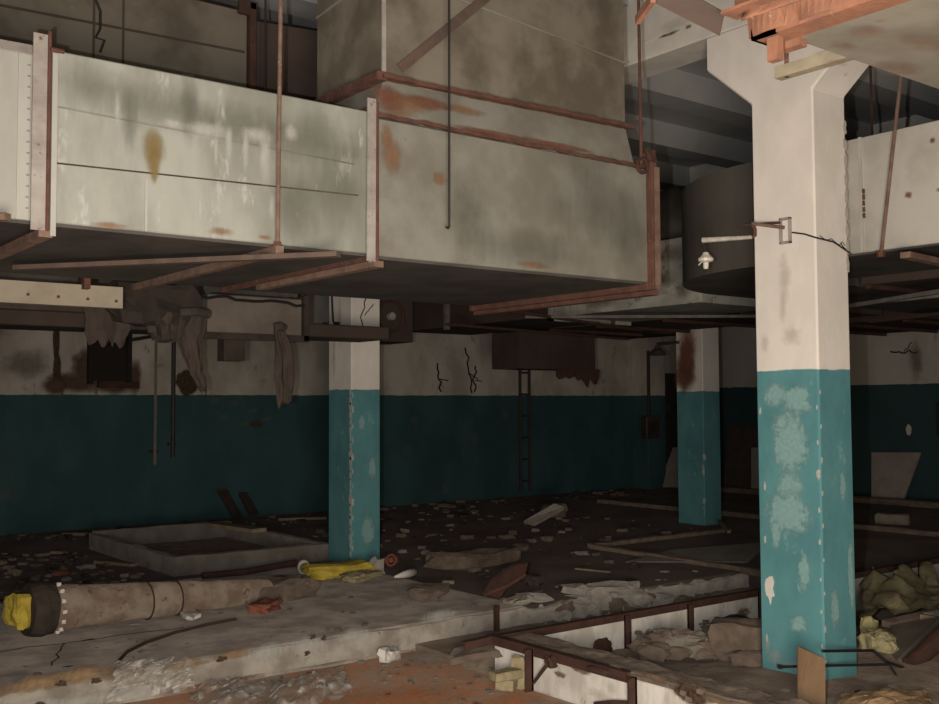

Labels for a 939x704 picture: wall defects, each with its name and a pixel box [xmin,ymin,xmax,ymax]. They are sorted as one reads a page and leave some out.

corrosion [377,88,471,114]
corrosion [148,139,159,178]
crack [437,348,482,394]
corrosion [677,333,693,388]
peeling [348,390,374,557]
peeling [759,383,824,547]
spalling [765,576,775,605]